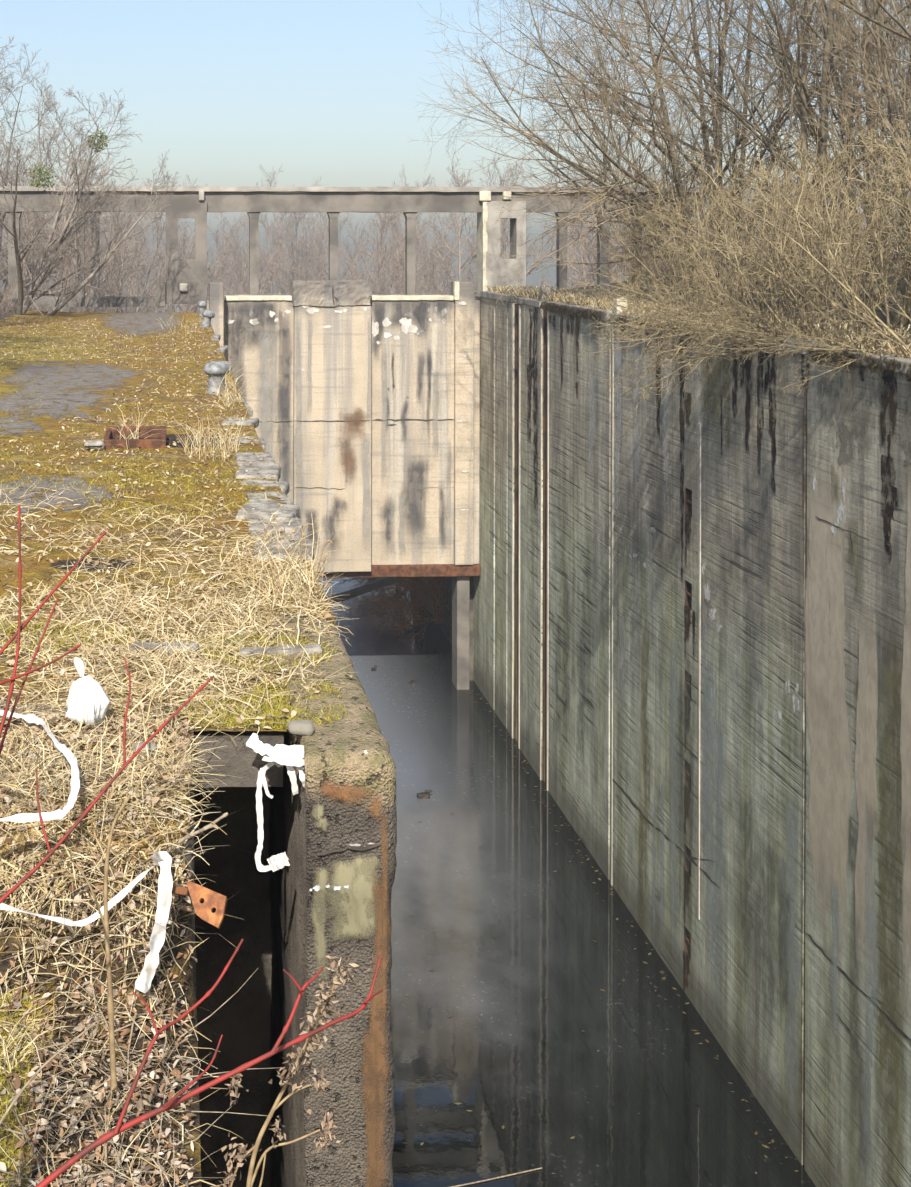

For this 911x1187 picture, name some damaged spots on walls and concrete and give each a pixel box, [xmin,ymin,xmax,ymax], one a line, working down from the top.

damp [363,431,385,536]
damp [384,464,424,548]
damp [440,491,468,540]